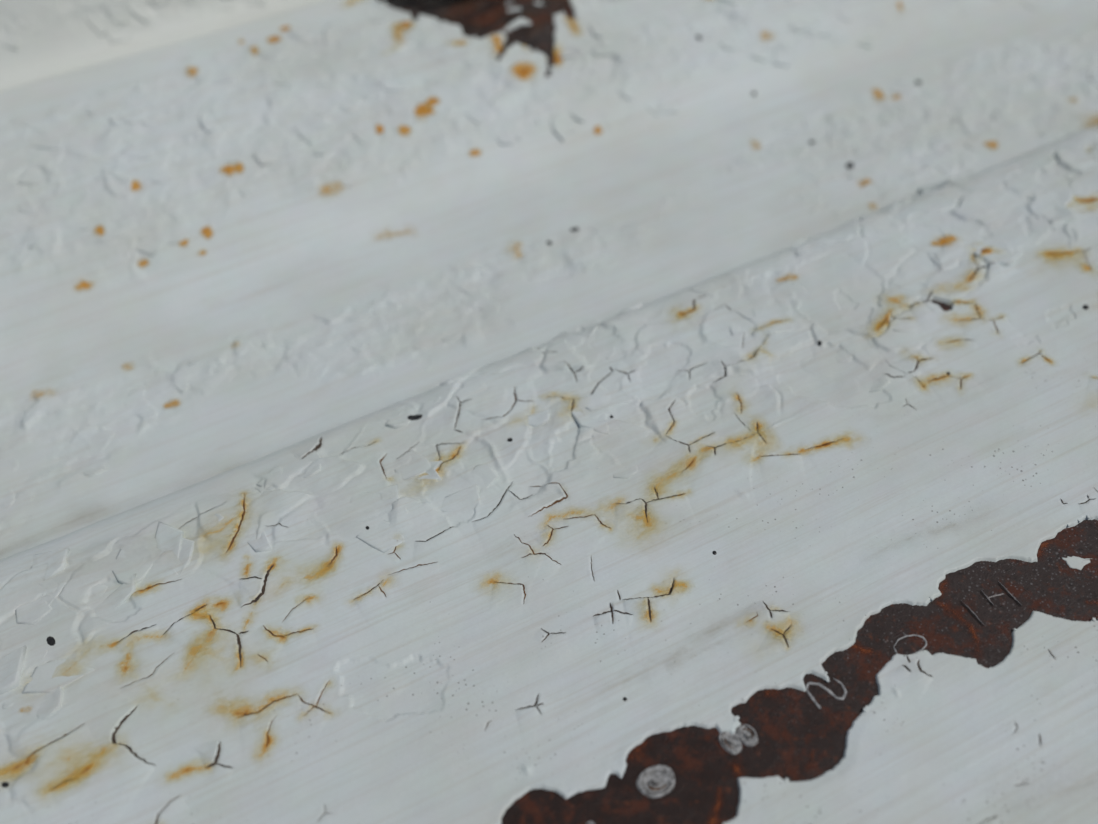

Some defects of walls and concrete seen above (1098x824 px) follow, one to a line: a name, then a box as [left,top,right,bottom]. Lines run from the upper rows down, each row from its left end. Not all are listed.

peeling [378,0,577,83]
rust [513,63,536,79]
rust [415,97,439,117]
rust [221,163,243,175]
crack [301,397,470,479]
crack [355,296,844,599]
rust [788,438,850,454]
crack [225,493,245,554]
rust [188,600,229,665]
crack [594,581,674,622]
crack [111,564,314,768]
peeling [501,515,1098,824]